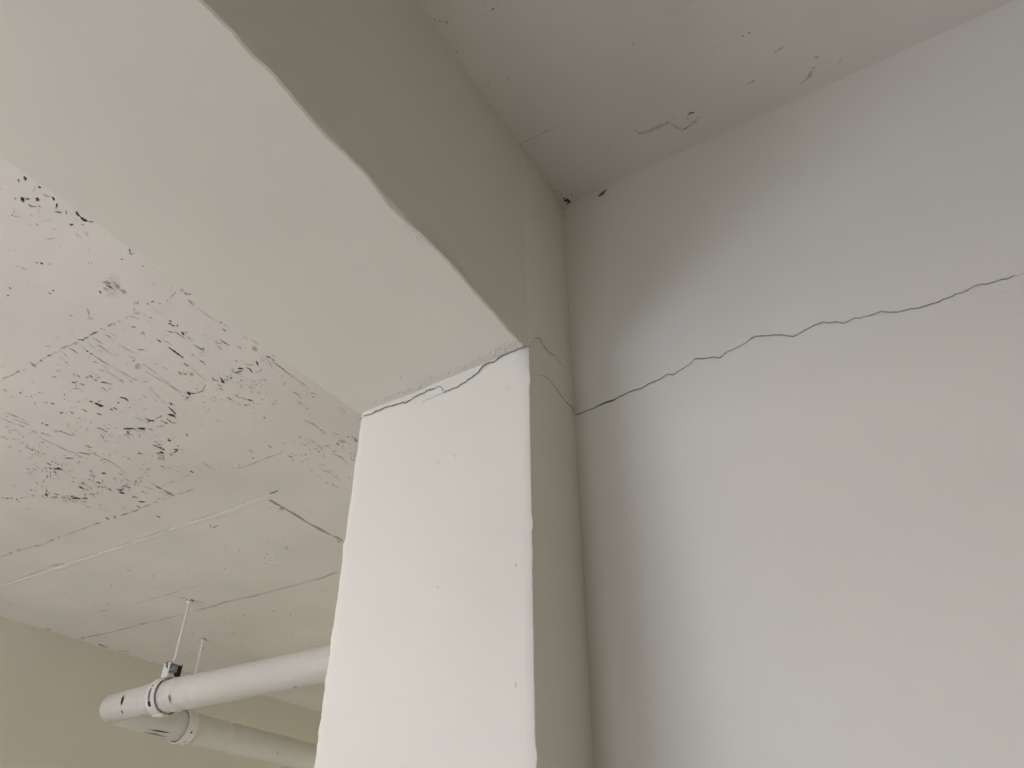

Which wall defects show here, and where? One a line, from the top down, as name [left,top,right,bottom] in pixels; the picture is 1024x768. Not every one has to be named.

crack [359,341,534,420]